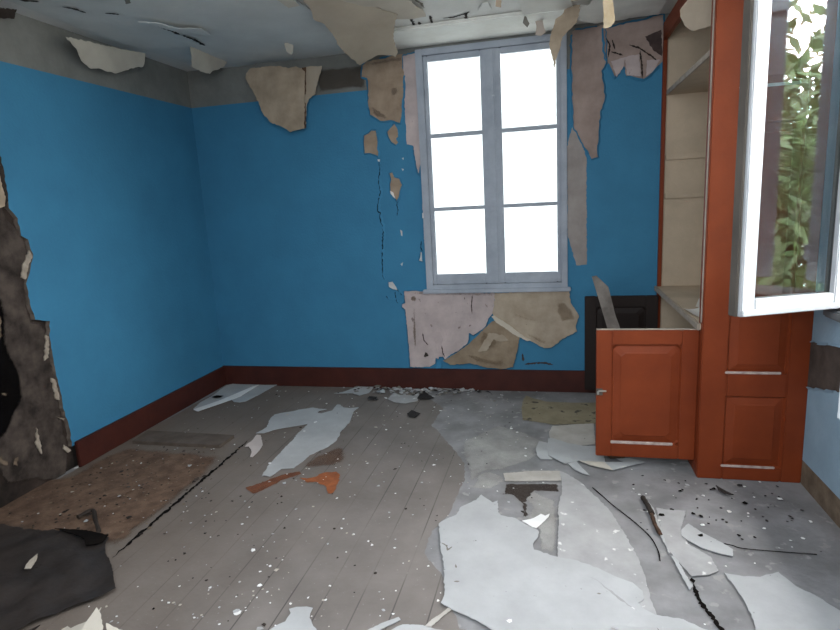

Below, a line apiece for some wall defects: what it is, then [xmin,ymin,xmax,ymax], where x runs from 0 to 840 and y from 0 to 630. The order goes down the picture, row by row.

peeling [360,51,421,176]
peeling [389,169,404,202]
peeling [567,14,666,265]
flaking render [0,207,71,483]
flaking render [388,280,495,369]
flaking render [806,340,840,393]